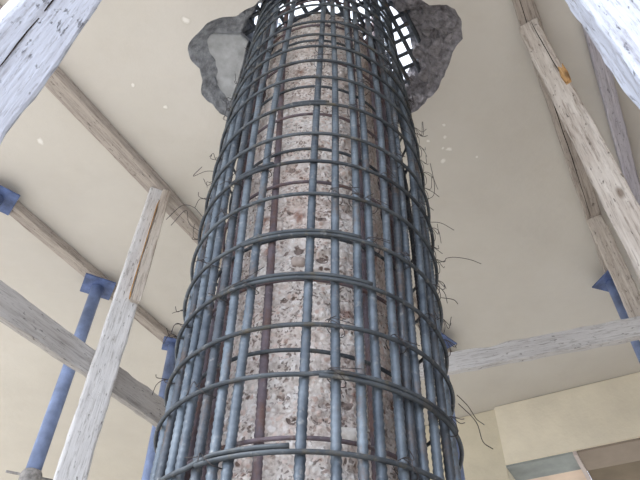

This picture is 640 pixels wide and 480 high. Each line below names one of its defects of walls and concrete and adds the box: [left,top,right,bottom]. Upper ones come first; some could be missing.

spalling [150,0,463,480]